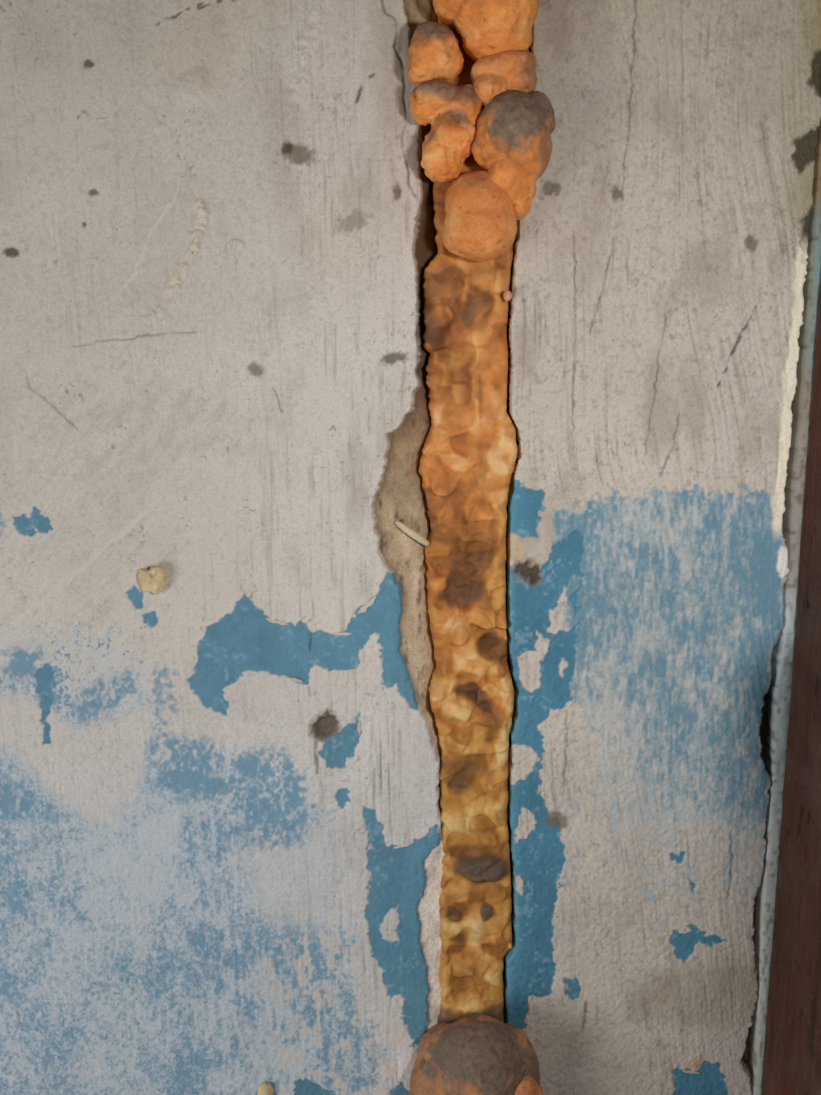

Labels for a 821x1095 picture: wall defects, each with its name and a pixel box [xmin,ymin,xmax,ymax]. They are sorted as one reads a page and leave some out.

spalling [403,0,438,47]
peeling [10,504,58,540]
peeling [121,579,165,633]
peeling [183,123,445,1054]
peeling [30,657,62,752]
peeling [503,476,590,1036]
peeling [667,848,699,900]
peeling [667,921,731,958]
peeling [290,1076,338,1095]
peeling [387,1075,410,1095]
peeling [666,1056,733,1095]